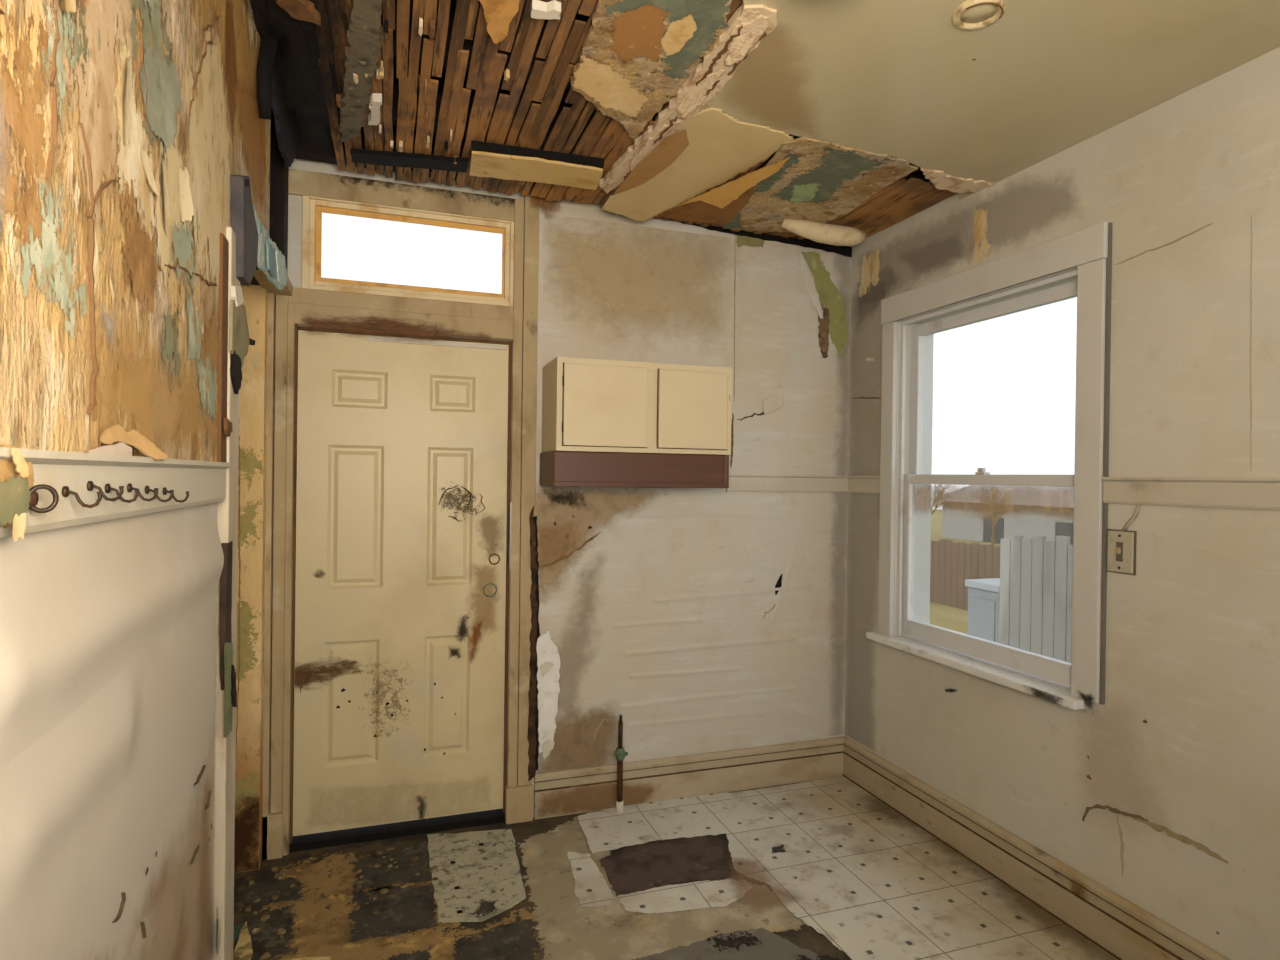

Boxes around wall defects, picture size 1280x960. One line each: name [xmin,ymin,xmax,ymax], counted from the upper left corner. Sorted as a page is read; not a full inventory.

crack [188,15,220,116]
spalling [599,3,777,194]
crack [46,10,121,420]
peeling [0,0,256,436]
crack [165,257,217,287]
peeling [252,204,288,290]
peeling [735,235,765,248]
peeling [800,251,848,358]
water stain [535,490,647,590]
water stain [543,713,614,772]
water stain [234,798,259,873]
crack [1082,804,1229,878]